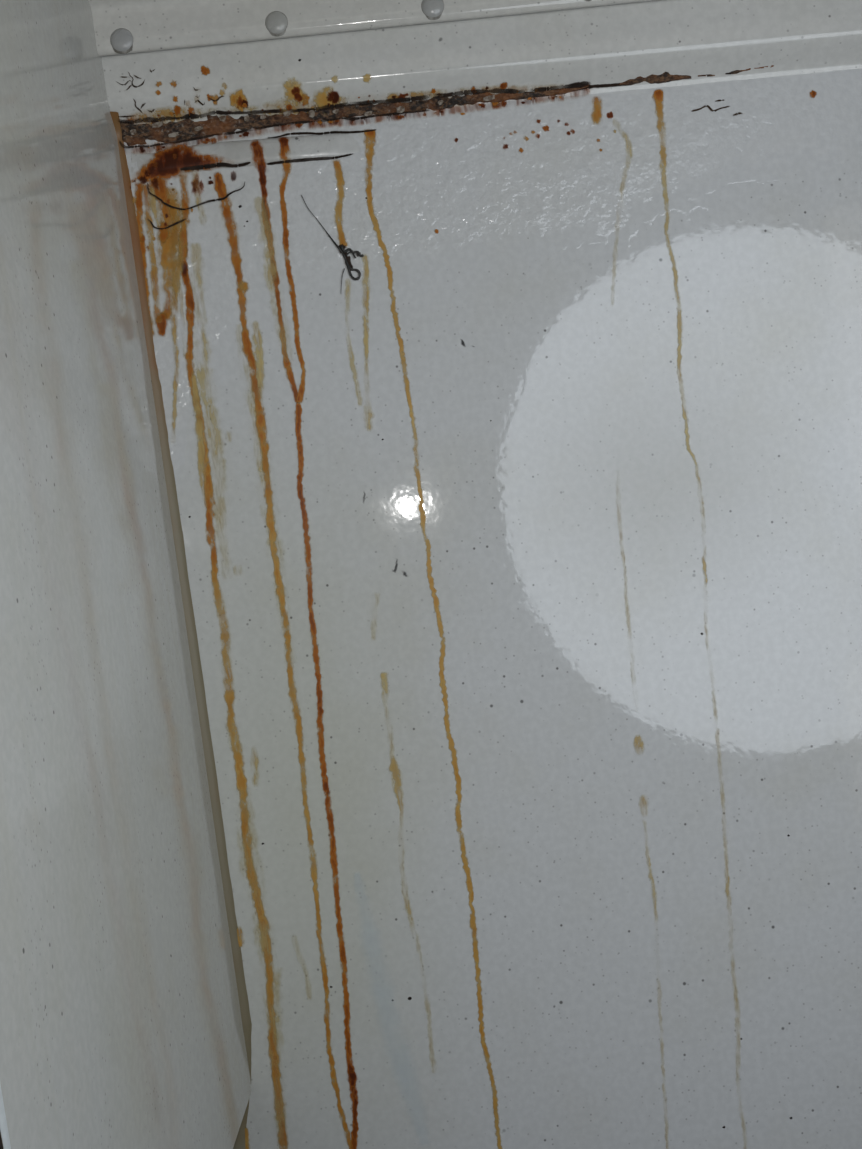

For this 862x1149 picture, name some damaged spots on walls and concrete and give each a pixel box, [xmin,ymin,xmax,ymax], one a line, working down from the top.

crack [117,69,629,229]
corrosion [358,74,440,119]
corrosion [471,82,507,108]
corrosion [503,120,575,153]
corrosion [592,97,631,156]
corrosion [653,89,682,376]
corrosion [350,256,369,379]
corrosion [683,408,696,463]
corrosion [128,76,359,1149]
corrosion [364,131,502,1149]